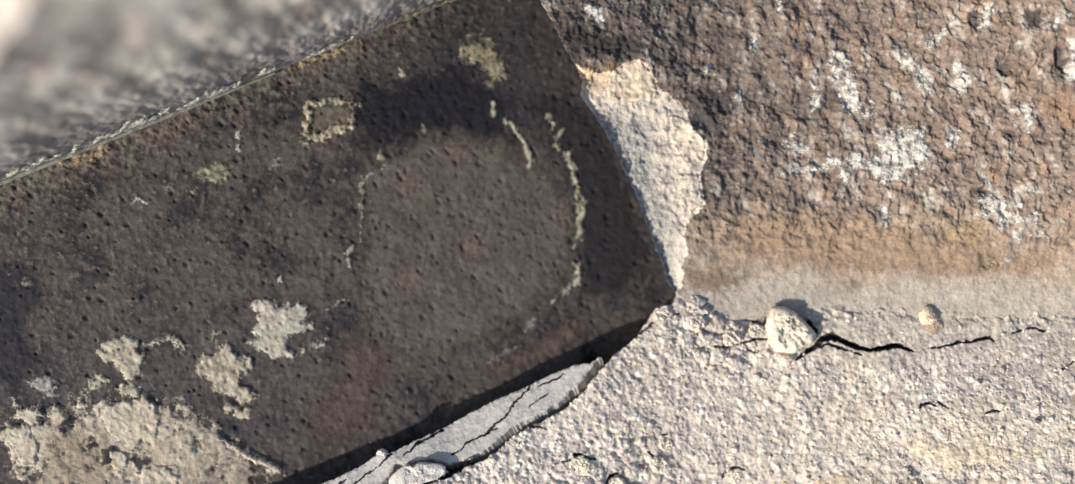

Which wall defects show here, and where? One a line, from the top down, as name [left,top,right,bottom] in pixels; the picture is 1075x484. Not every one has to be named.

leakage [302,36,357,61]
leakage [310,104,352,134]
leakage [491,101,535,168]
leakage [343,149,392,268]
leakage [545,112,587,304]
spalling [575,59,708,292]
crack [714,320,768,353]
crack [796,319,1046,360]
peeling [0,299,327,484]